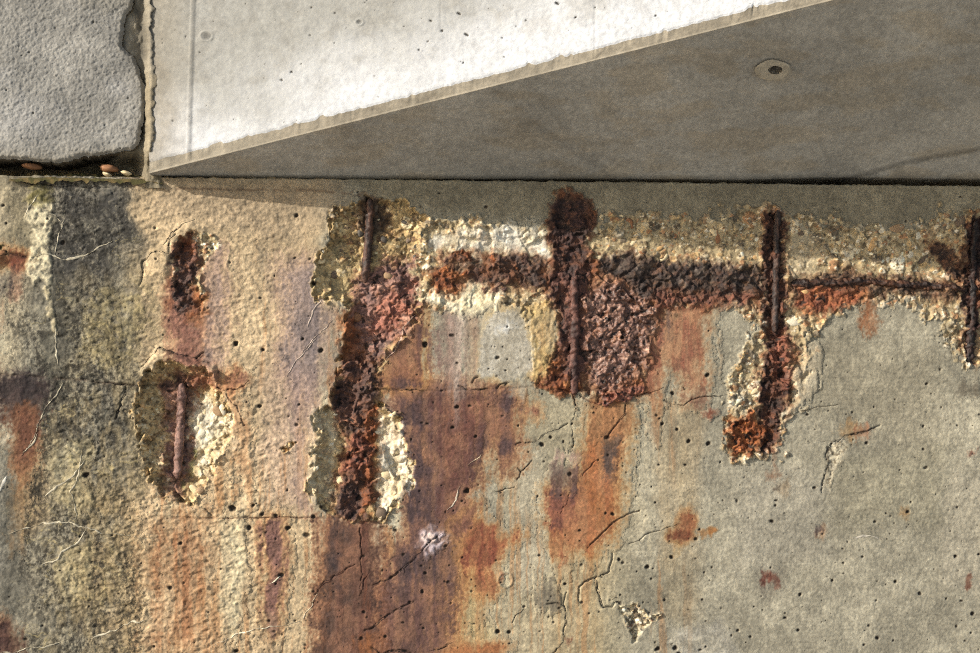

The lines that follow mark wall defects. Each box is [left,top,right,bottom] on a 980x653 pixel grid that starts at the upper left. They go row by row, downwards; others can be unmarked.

rust [0,237,29,305]
water stain [21,182,59,336]
spalling [303,185,980,524]
rust [0,363,61,563]
spalling [124,358,239,505]
rust [116,358,260,653]
rust [250,304,725,653]
crack [495,389,718,492]
rust [0,602,29,653]
crack [211,535,440,653]
crack [555,511,639,652]